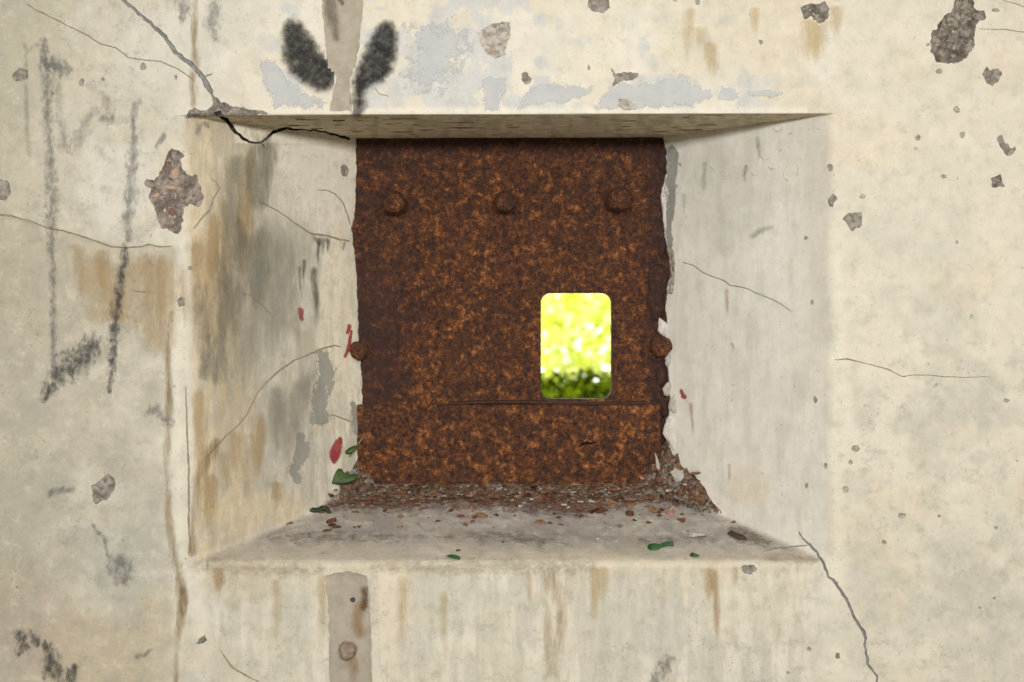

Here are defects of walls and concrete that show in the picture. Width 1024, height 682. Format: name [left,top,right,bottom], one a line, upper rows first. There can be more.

crack [27,0,350,144]
peeling [402,16,511,97]
spalling [926,0,1000,74]
crack [0,214,172,249]
flaking render [144,148,204,234]
leakage [44,247,128,400]
crack [682,262,792,312]
crack [835,358,988,378]
crack [185,345,340,550]
crack [762,531,878,682]